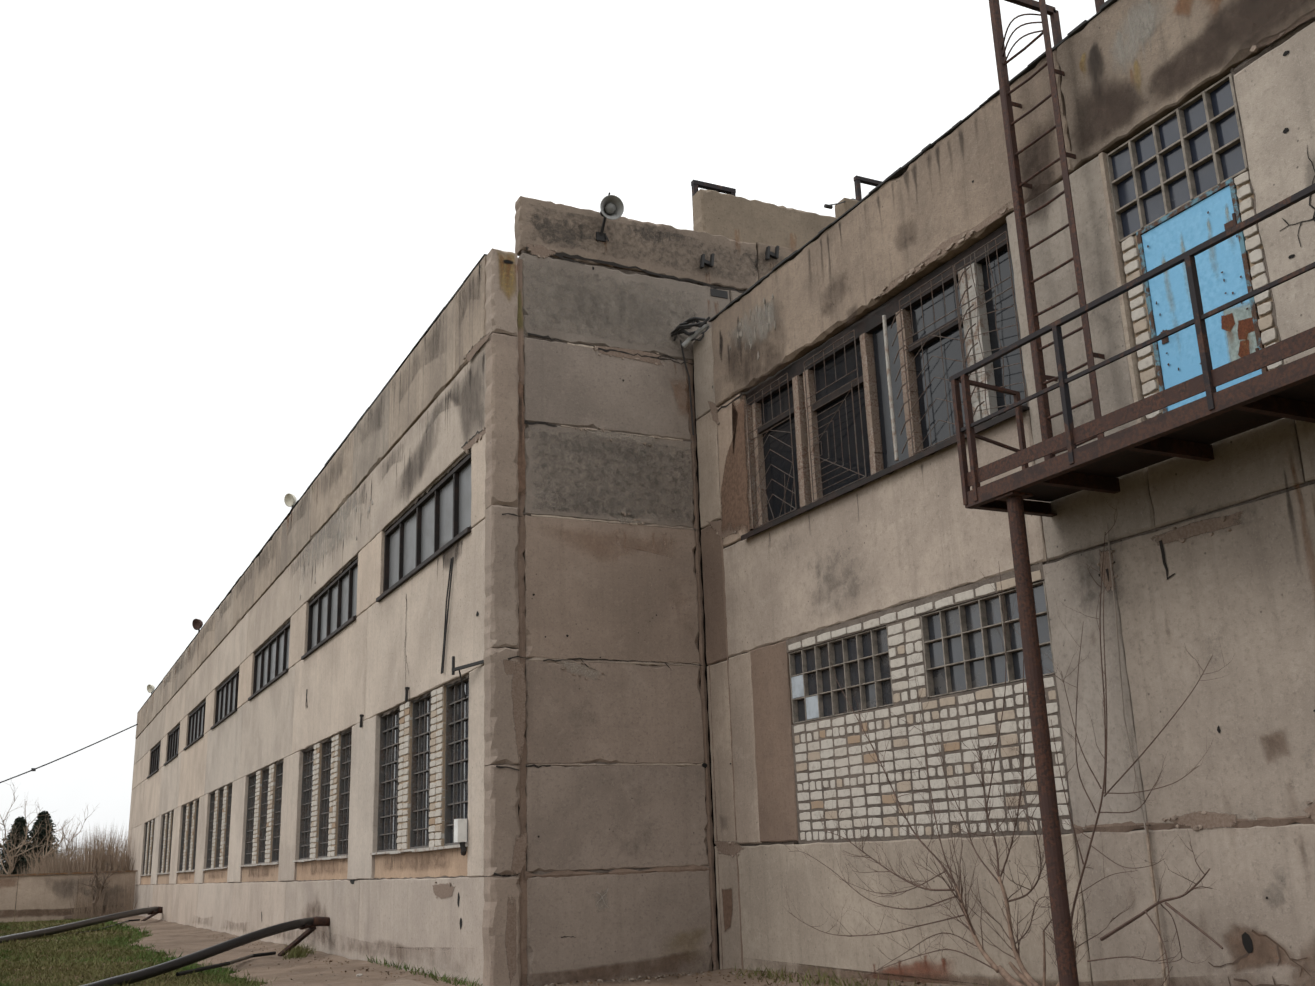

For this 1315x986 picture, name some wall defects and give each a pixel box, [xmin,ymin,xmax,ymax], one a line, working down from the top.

damp [1152,0,1303,96]
damp [1078,85,1140,146]
crack [1280,147,1315,247]
rust [499,256,515,295]
damp [396,431,427,490]
crack [1159,540,1175,580]
spalling [433,882,455,899]
spalling [1242,932,1253,953]